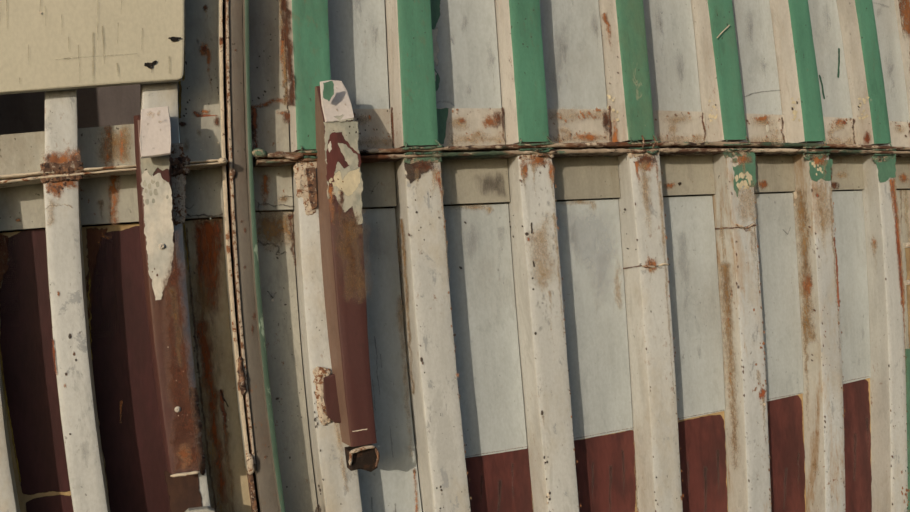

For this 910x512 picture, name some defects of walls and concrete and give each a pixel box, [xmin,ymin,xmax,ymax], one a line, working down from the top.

corrosion [898,0,910,35]
corrosion [251,0,295,151]
corrosion [43,149,80,164]
corrosion [46,180,77,197]
peeling [140,155,183,300]
corrosion [164,0,266,512]
corrosion [257,214,296,266]
peeling [326,115,361,203]
corrosion [412,160,443,196]
peeling [729,156,752,193]
corrosion [796,190,826,371]
corrosion [889,174,907,341]